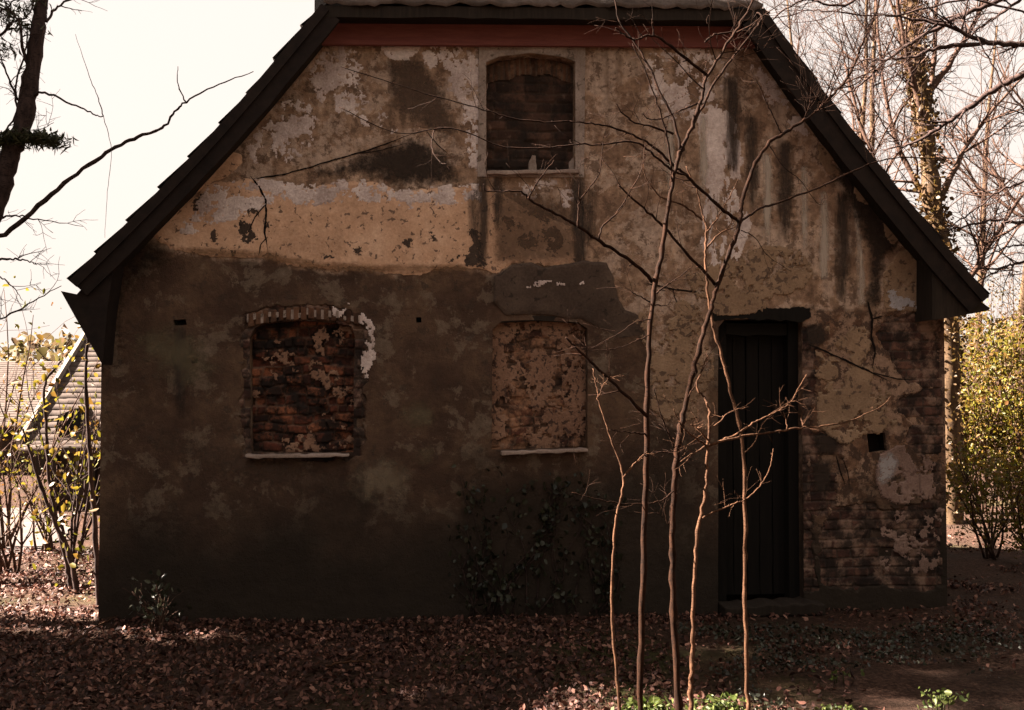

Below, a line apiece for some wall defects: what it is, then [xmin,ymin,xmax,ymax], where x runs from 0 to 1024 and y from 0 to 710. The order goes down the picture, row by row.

crack [248,131,449,256]
peeling [154,46,583,276]
leakage [314,139,458,186]
leakage [389,61,456,137]
leakage [724,77,807,235]
leakage [820,170,898,306]
spalling [802,220,945,592]